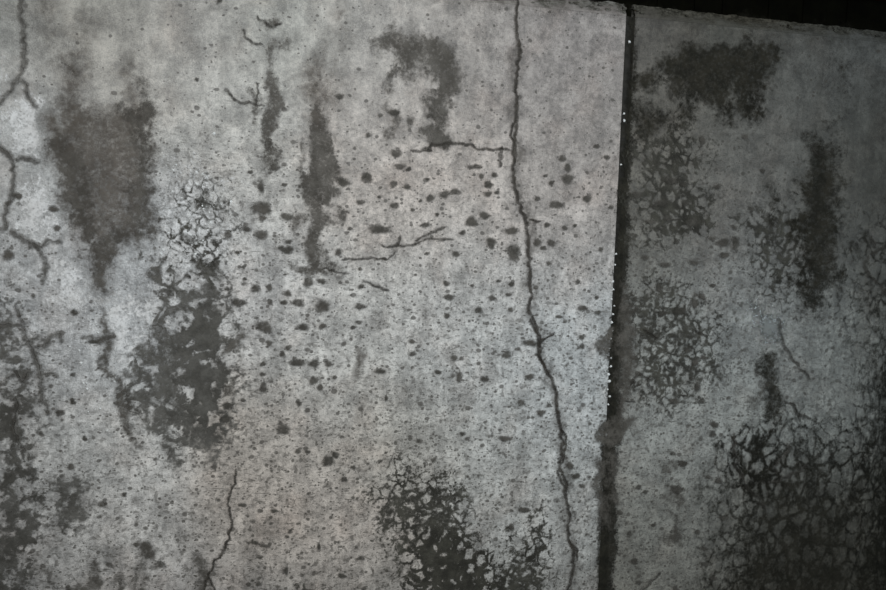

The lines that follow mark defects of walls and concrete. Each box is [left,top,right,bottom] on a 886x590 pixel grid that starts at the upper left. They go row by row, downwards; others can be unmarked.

crack [0,0,37,106]
water stain [372,25,461,149]
crack [0,146,62,285]
water stain [0,283,107,590]
water stain [1,65,272,469]
water stain [278,68,353,286]
crack [411,0,579,590]
water stain [568,17,886,590]
crack [779,321,810,379]
crack [785,401,811,419]
crack [204,470,237,590]
water stain [365,452,559,590]